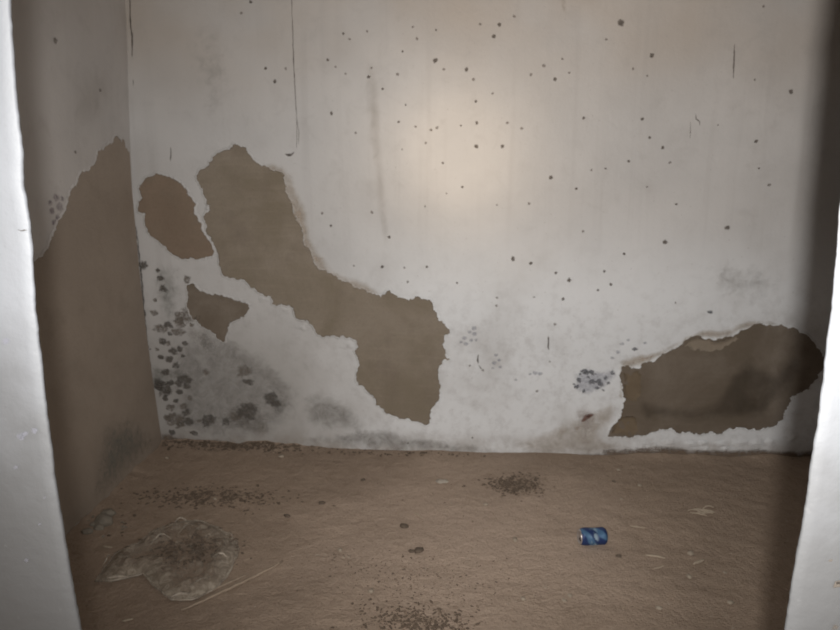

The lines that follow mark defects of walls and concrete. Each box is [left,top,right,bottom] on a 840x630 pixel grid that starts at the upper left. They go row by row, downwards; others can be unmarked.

crack [286,0,299,156]
peeling [34,133,452,534]
water stain [573,369,615,393]
peeling [605,321,825,440]